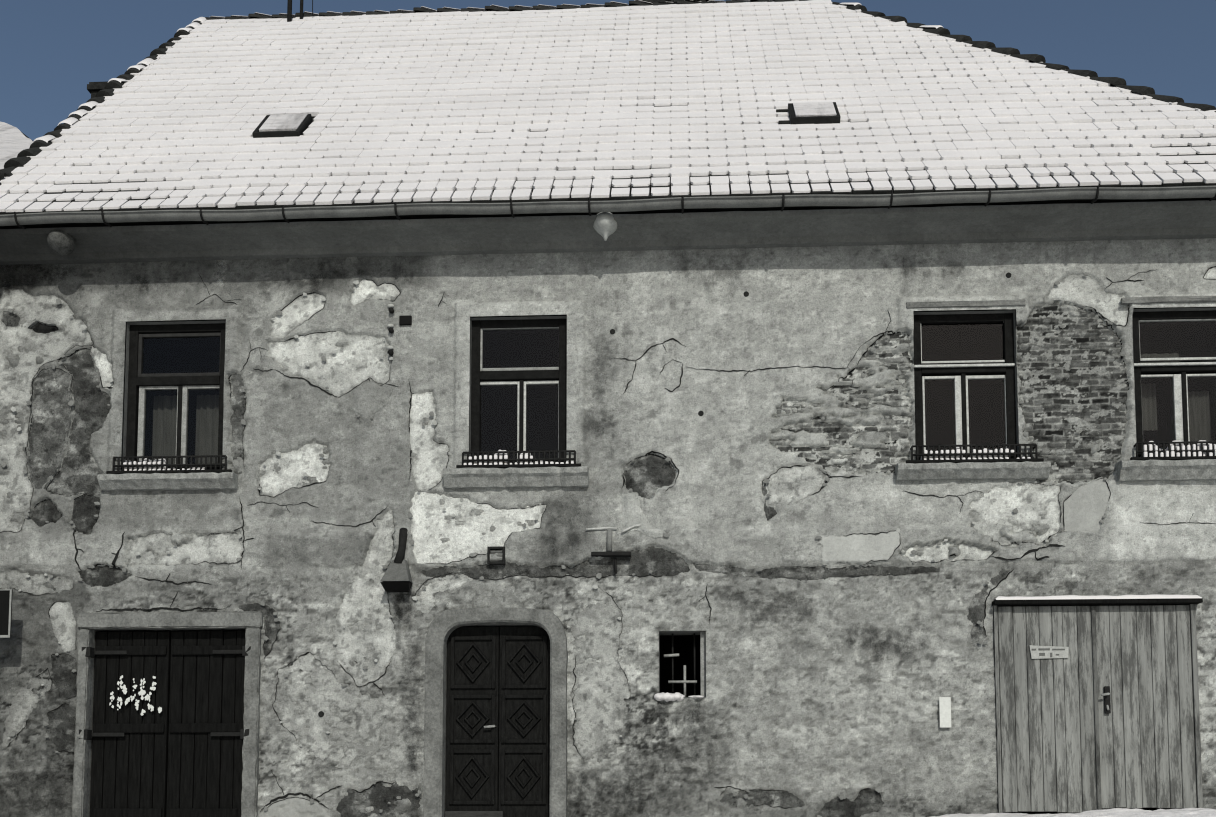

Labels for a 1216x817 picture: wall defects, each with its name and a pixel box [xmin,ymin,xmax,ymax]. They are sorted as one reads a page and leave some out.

crack [617,311,893,394]
flaking render [0,287,114,535]
spalling [228,373,247,474]
crack [73,530,83,571]
crack [97,532,225,612]
flaking render [257,441,330,497]
crack [234,497,387,569]
flaking render [268,272,1130,770]
crack [906,491,981,512]
crack [991,494,1072,561]
spalling [239,602,282,658]